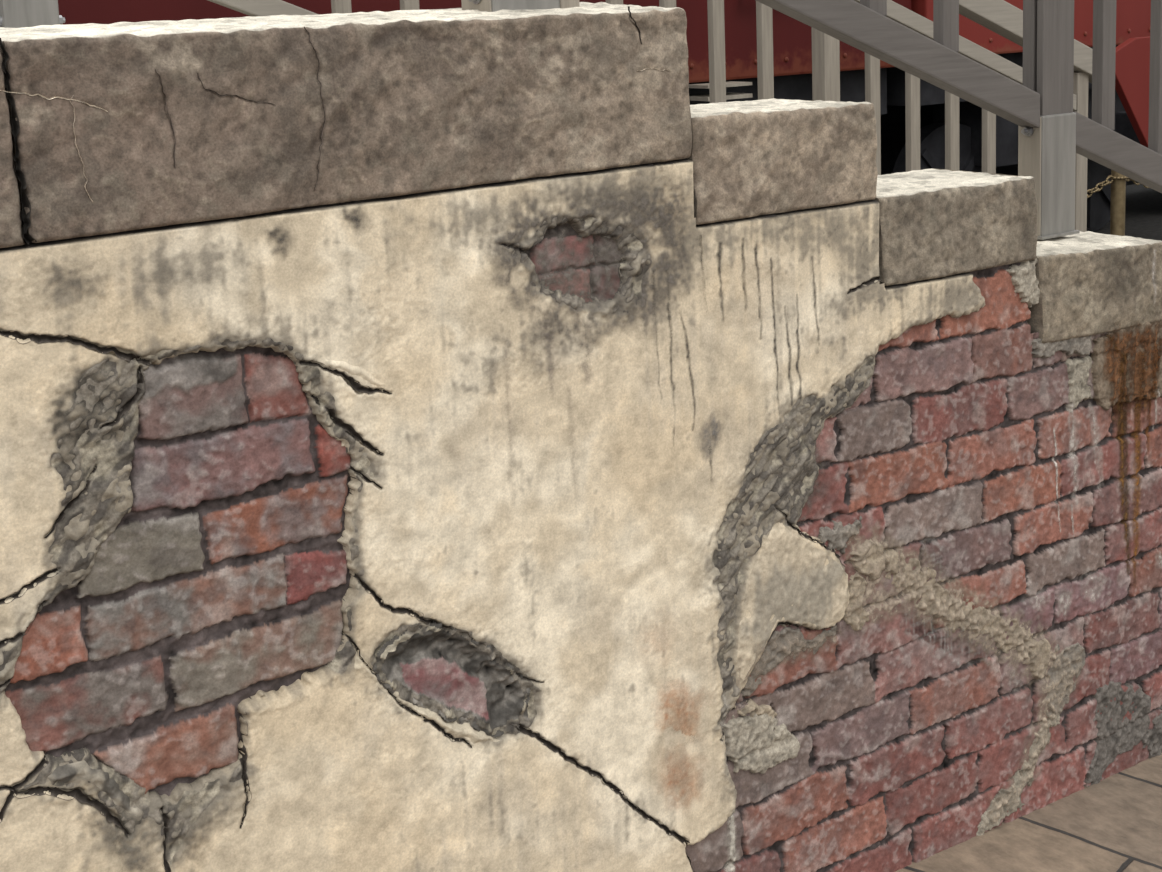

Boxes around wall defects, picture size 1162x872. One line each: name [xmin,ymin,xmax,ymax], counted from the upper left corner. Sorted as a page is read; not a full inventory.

crack [0,38,108,244]
crack [0,331,150,429]
flaking render [504,216,652,315]
leakage [742,239,801,403]
rust [1104,324,1162,567]
flaking render [0,336,385,866]
flaking render [685,257,1162,872]
flaking render [372,621,540,739]
crack [0,751,131,837]
crack [160,807,171,872]
crack [236,709,252,828]
crack [506,721,695,872]